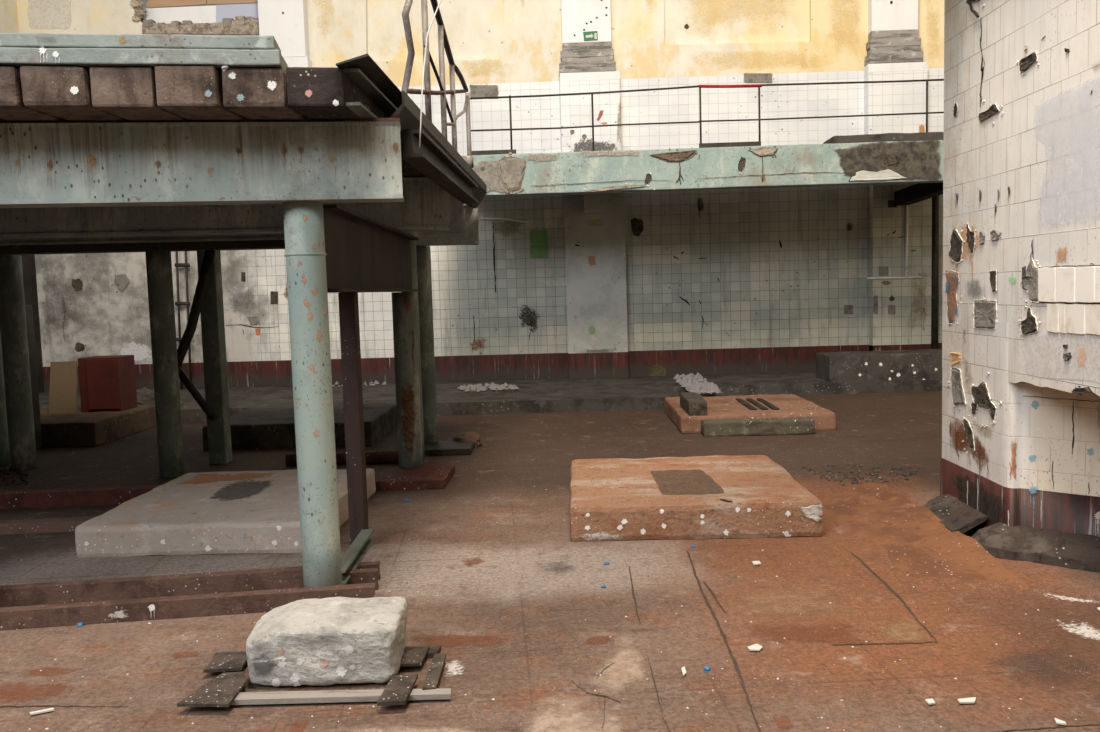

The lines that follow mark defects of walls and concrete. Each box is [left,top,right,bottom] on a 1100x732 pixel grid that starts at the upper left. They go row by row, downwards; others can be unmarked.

spalling [130,0,148,22]
crack [978,21,986,107]
spalling [570,130,700,162]
spalling [473,152,557,194]
spalling [584,172,655,192]
peeling [845,154,908,181]
peeling [944,223,1001,330]
peeling [1018,258,1048,336]
rust [401,386,415,453]
peeling [946,352,1002,453]
spalling [1071,386,1092,395]
rust [1009,443,1017,480]